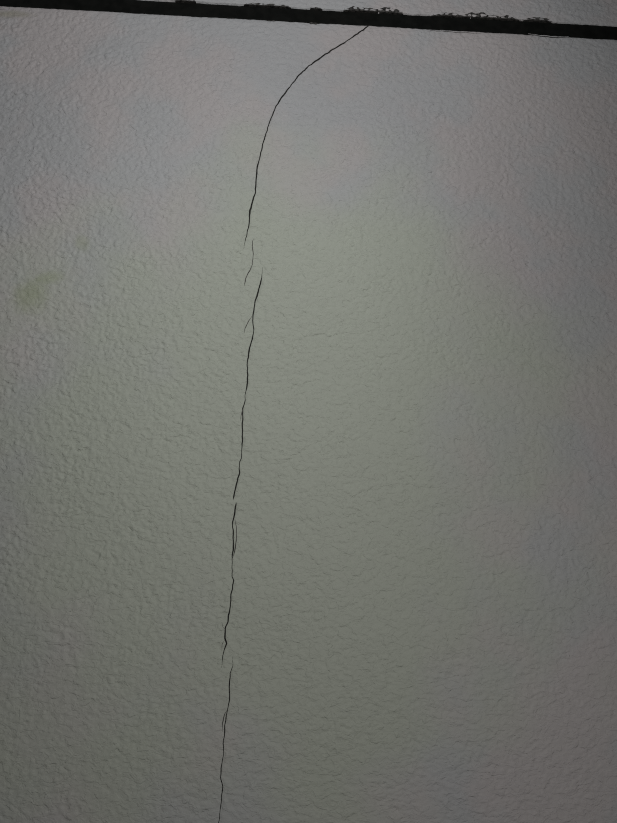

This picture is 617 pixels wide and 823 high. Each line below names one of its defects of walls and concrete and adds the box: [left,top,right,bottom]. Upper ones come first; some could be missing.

crack [218,25,369,823]